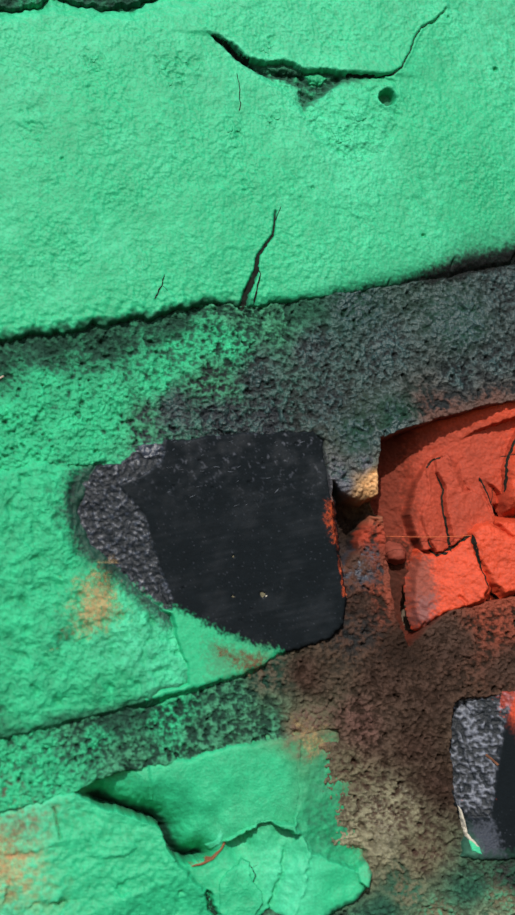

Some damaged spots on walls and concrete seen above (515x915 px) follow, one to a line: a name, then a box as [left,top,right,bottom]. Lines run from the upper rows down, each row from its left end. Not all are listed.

crack [211,35,250,111]
crack [345,10,445,79]
crack [240,207,281,311]
spalling [73,441,173,608]
crack [426,457,489,588]
spalling [403,429,515,631]
crack [479,439,515,513]
spalling [75,735,299,867]
spalling [219,857,263,915]